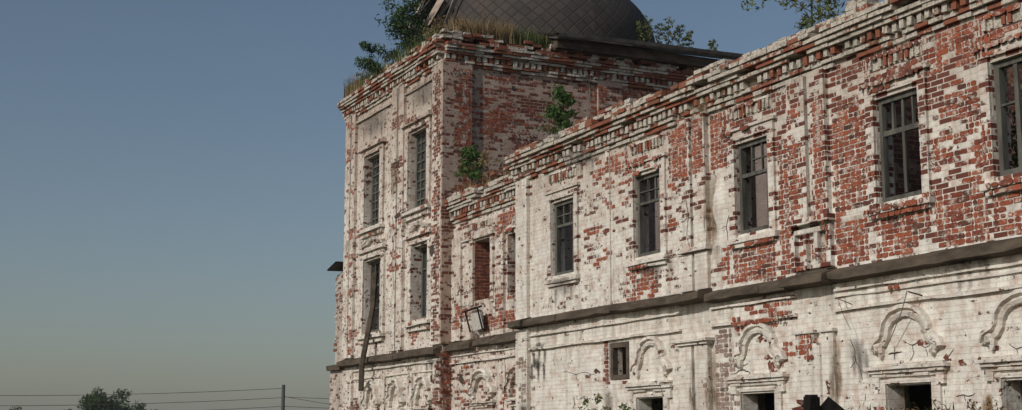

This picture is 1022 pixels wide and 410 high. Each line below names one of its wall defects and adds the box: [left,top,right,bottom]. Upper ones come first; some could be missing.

peeling [566,3,1022,284]
peeling [626,263,662,302]
spalling [594,341,610,384]
peeling [703,295,795,410]
peeling [764,333,817,373]